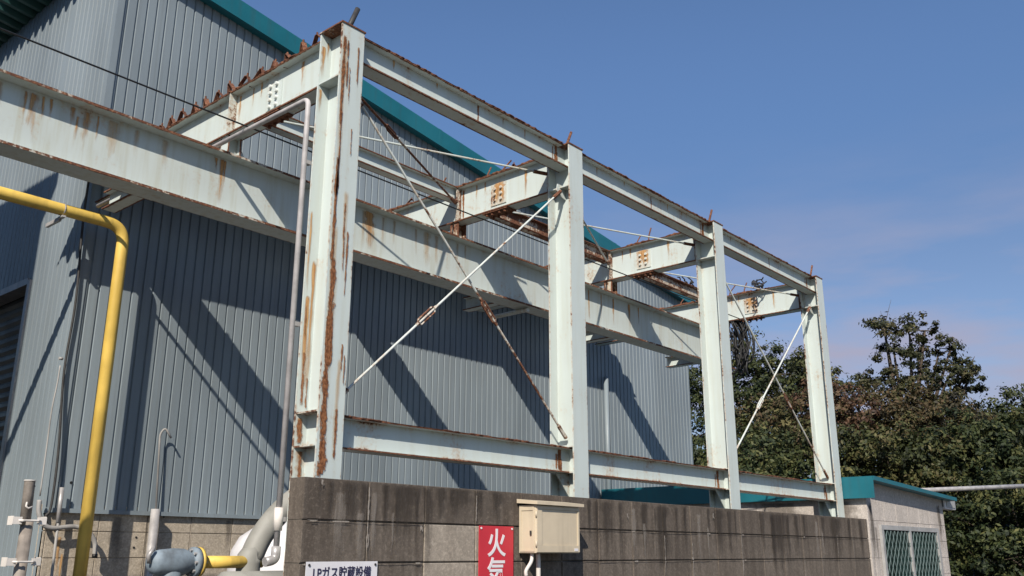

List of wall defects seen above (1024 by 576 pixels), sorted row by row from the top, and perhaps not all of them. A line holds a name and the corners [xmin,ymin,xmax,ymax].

corrosion [24,92,53,112]
corrosion [165,43,329,129]
corrosion [215,158,226,192]
corrosion [317,36,565,478]
corrosion [296,213,316,477]
water stain [384,485,481,519]
water stain [760,513,805,552]
water stain [822,505,875,543]